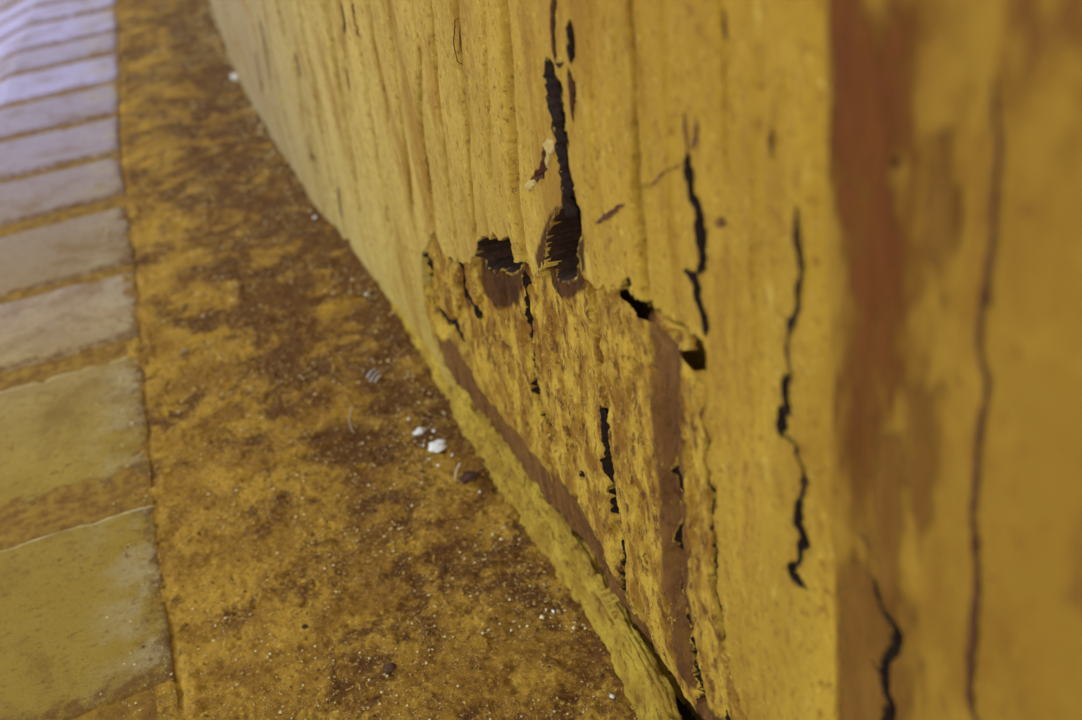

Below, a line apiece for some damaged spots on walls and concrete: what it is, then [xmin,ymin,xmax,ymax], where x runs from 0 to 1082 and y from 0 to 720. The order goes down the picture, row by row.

crack [524,0,709,337]
spalling [425,194,747,720]
crack [674,522,705,720]
crack [672,466,726,641]
crack [775,205,810,590]
crack [858,531,904,720]
crack [965,73,1002,720]